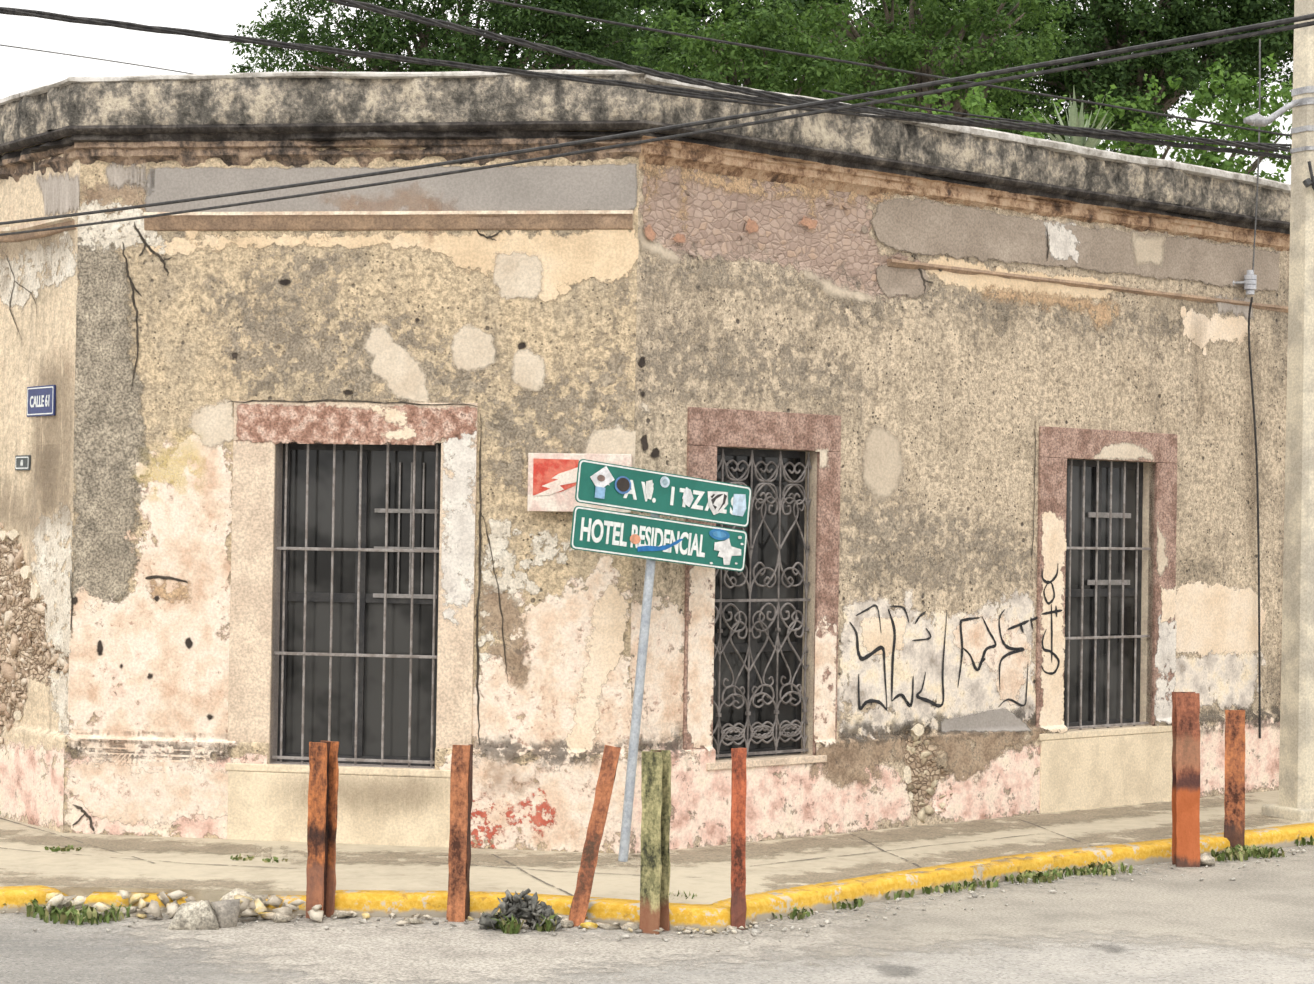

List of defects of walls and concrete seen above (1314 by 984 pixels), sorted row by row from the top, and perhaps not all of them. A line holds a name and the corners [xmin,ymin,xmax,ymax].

crack [122,222,173,390]
spalling [639,162,920,301]
peeling [0,402,1068,854]
peeling [1154,522,1280,797]